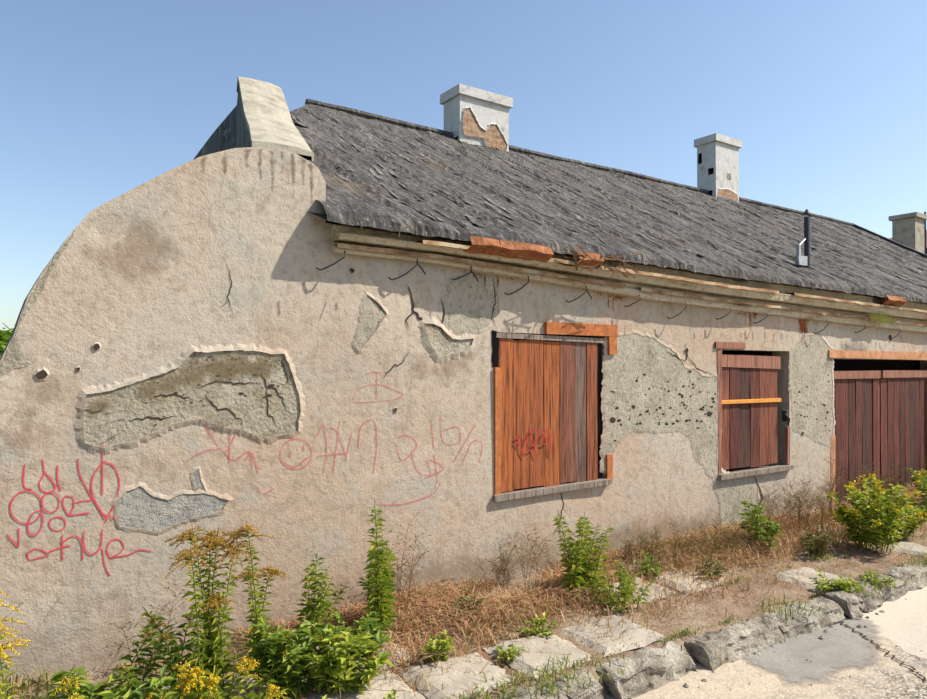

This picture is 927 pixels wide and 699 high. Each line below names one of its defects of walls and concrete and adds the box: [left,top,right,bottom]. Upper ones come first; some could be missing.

flaking render [350,291,390,354]
crack [385,287,447,376]
flaking render [417,271,502,367]
flaking render [73,343,306,455]
flaking render [599,329,764,528]
flaking render [788,328,836,449]
flaking render [110,466,234,536]